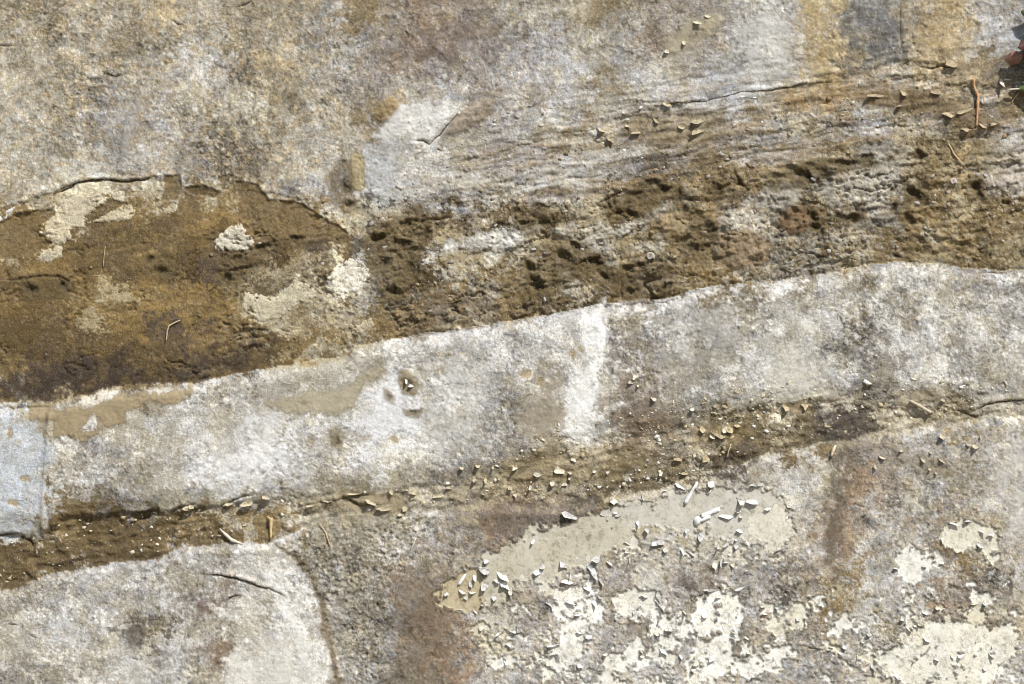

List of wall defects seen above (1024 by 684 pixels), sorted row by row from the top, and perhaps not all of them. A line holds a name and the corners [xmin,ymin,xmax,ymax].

crack [644,81,844,130]
crack [59,176,156,192]
peeling [699,424,740,439]
peeling [224,496,270,507]
peeling [347,488,408,516]
peeling [433,454,1024,684]
crack [213,574,284,602]